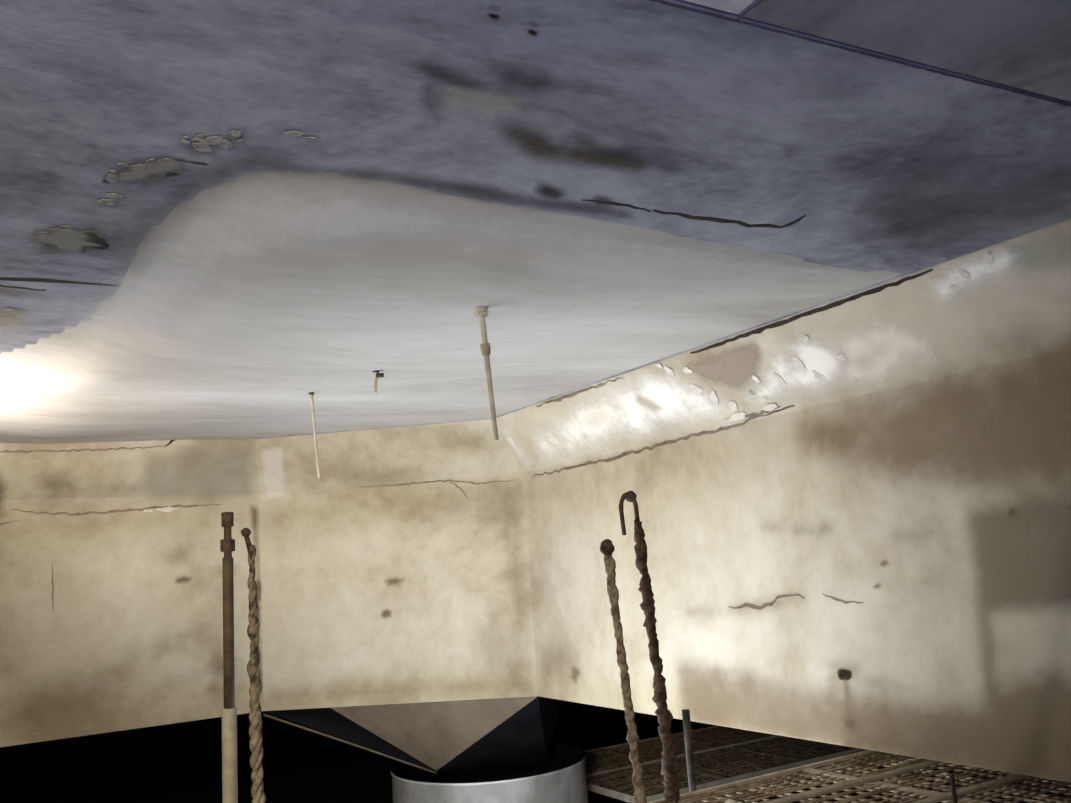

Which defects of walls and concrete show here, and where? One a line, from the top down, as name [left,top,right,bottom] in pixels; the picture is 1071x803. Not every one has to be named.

spalling [108,158,178,181]
crack [582,200,806,228]
crack [0,277,119,291]
peeling [539,323,935,456]
crack [363,403,794,499]
crack [0,504,223,525]
crack [728,594,863,610]